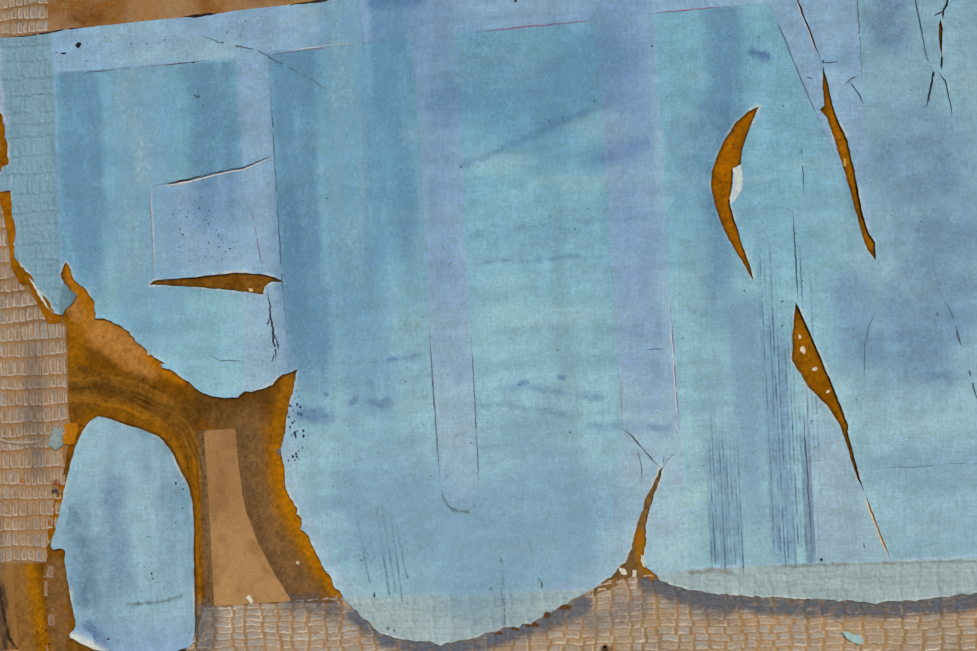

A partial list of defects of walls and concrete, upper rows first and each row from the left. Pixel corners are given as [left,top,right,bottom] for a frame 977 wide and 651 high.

crack [779,0,863,110]
crack [915,0,952,113]
crack [58,13,349,361]
peeling [711,107,759,279]
peeling [820,67,876,260]
peeling [0,113,343,651]
peeling [782,303,864,490]
peeling [589,468,666,596]
peeling [496,604,571,634]
peeling [842,631,864,645]